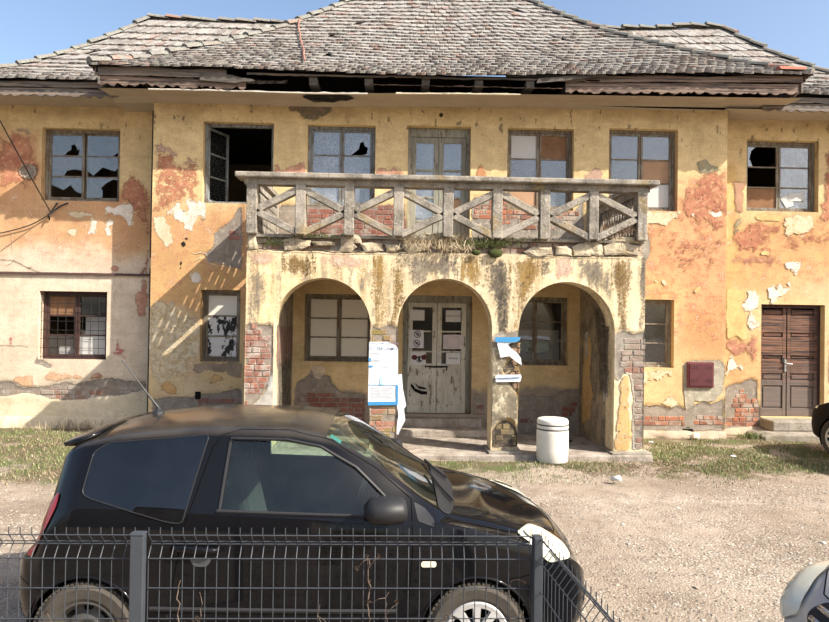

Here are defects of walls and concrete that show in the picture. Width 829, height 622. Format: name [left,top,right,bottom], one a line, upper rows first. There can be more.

peeling [68,143,206,248]
spalling [205,197,650,271]
peeling [647,153,829,271]
peeling [0,251,243,411]
damp [250,272,265,314]
flaking render [253,325,293,405]
flaking render [295,365,366,431]
damp [391,253,459,311]
damp [476,261,514,332]
flaking render [492,331,593,447]
damp [578,258,630,314]
spalling [644,379,761,431]